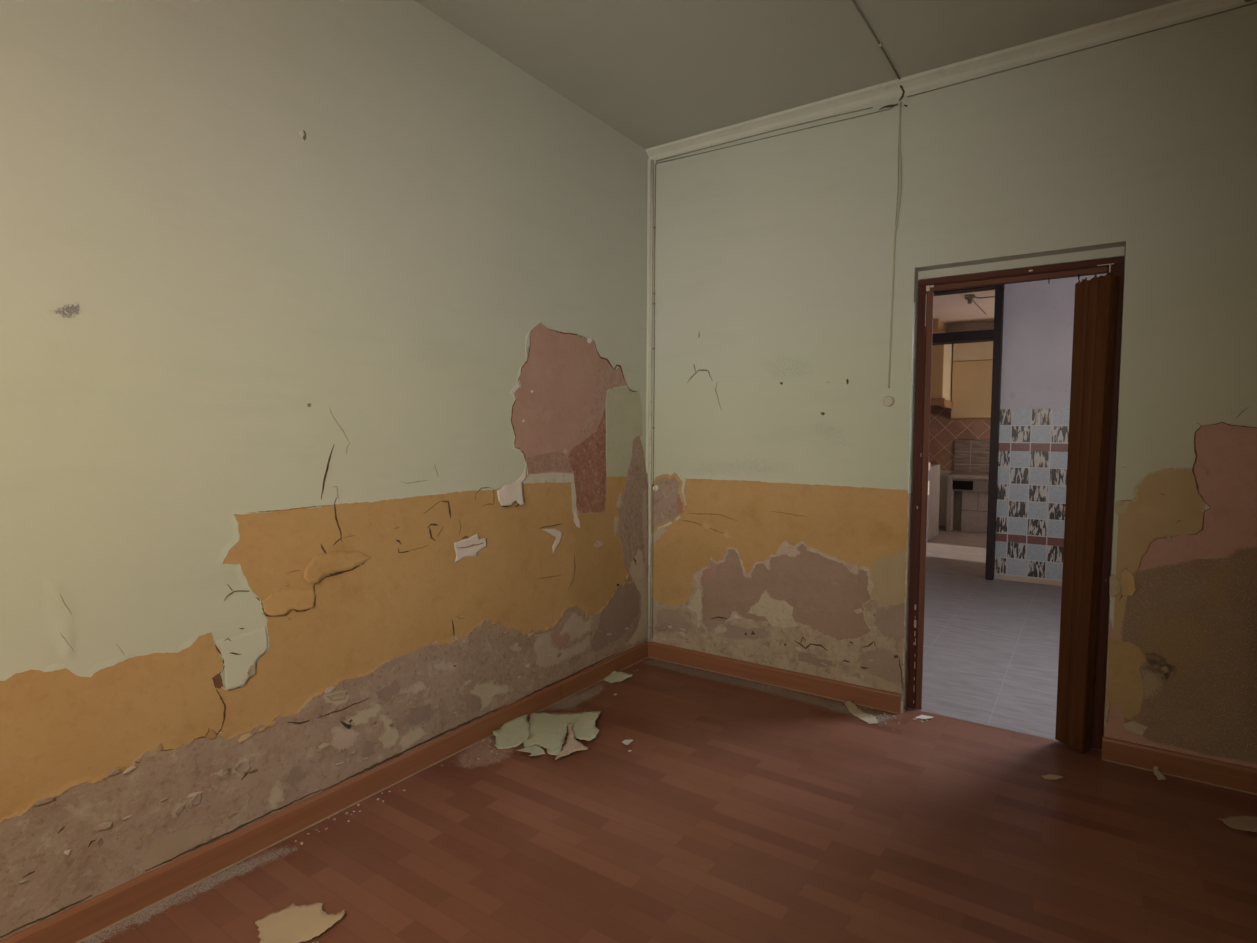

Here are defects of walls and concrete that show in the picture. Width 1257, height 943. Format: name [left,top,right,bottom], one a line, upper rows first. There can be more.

crack [224,409,365,617]
crack [145,653,617,871]
flaking render [0,319,933,943]
flaking render [1104,422,1257,768]